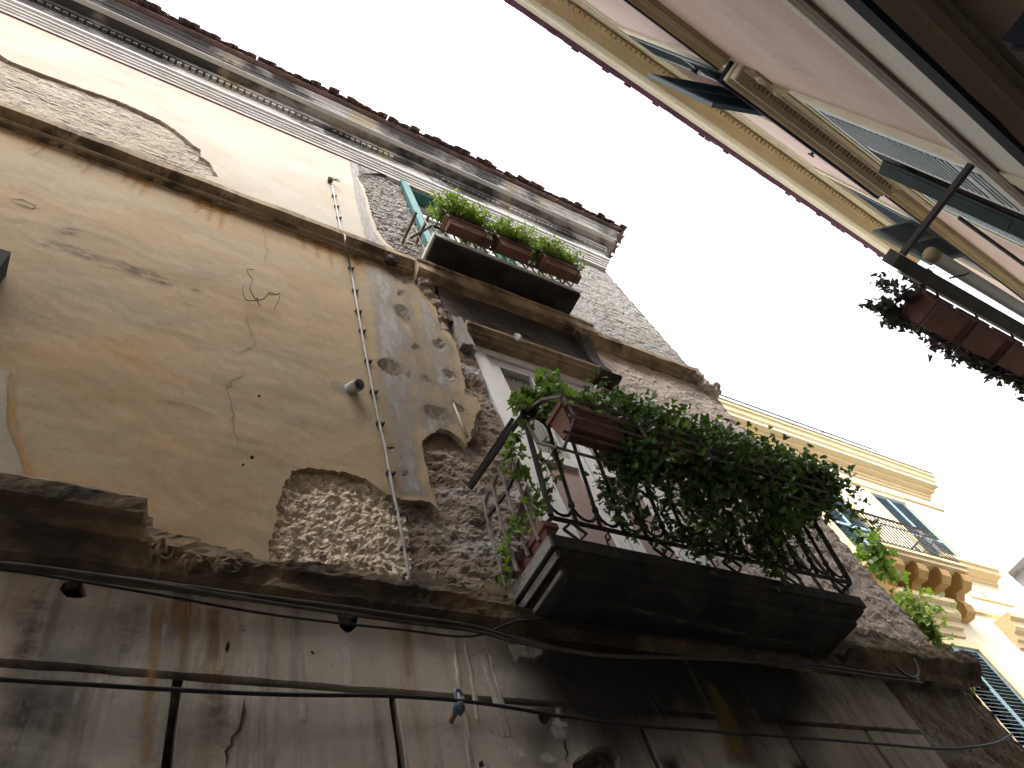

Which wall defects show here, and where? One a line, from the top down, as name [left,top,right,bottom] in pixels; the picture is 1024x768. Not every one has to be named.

spalling [0,59,215,178]
spalling [391,270,414,322]
crack [164,313,255,443]
spalling [269,322,531,591]
crack [224,700,246,766]